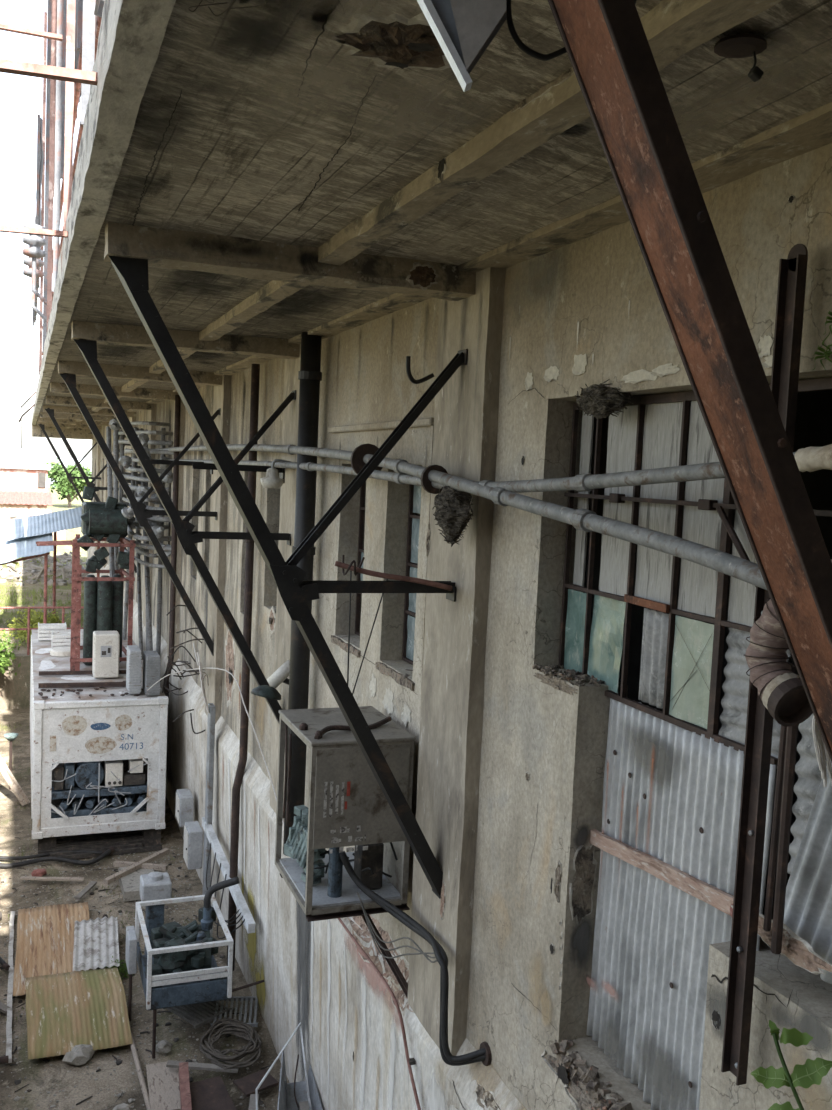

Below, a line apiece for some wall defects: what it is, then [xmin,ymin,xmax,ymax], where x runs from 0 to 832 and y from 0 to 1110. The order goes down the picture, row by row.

water stain [222,18,285,59]
crack [296,0,345,98]
spalling [335,12,451,70]
crack [132,90,182,226]
crack [298,76,376,212]
spalling [406,262,438,290]
peeling [524,354,587,391]
peeling [618,363,680,384]
water stain [575,825,589,848]
water stain [571,918,591,967]
flaking render [541,1049,607,1110]